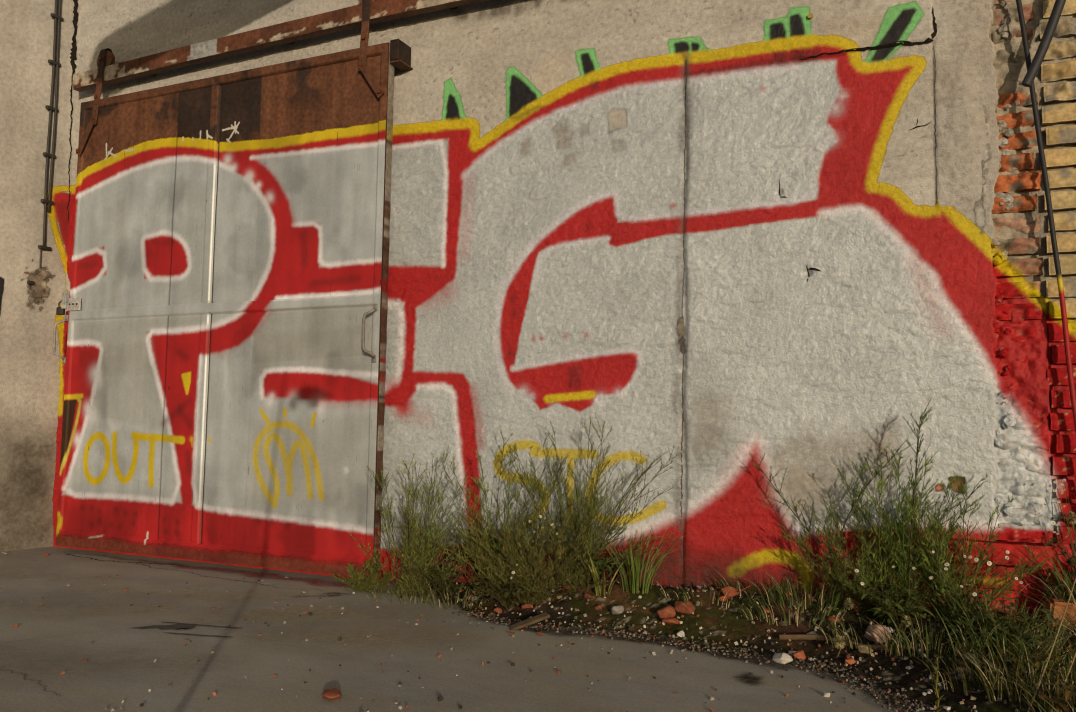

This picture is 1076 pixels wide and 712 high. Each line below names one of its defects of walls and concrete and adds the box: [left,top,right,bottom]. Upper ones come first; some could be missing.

crack [67,0,79,219]
crack [800,8,938,203]
spalling [974,0,1076,544]